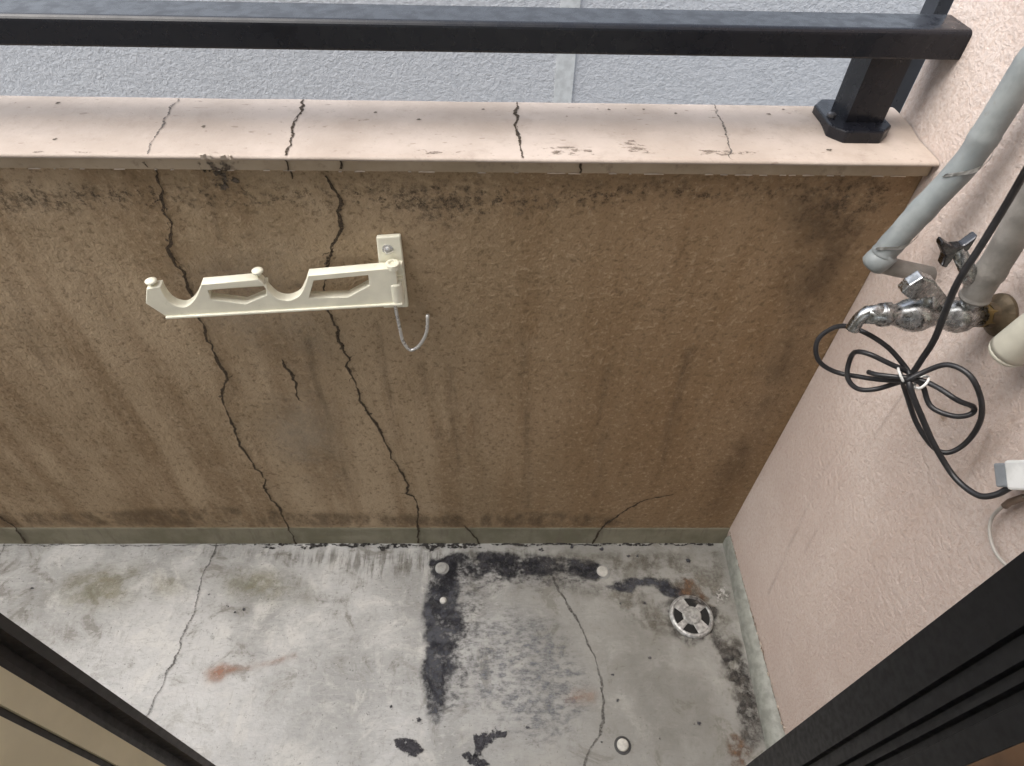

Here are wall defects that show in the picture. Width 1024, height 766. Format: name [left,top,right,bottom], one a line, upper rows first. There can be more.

crack [714,104,732,159]
crack [0,99,714,766]
leakage [399,552,729,730]